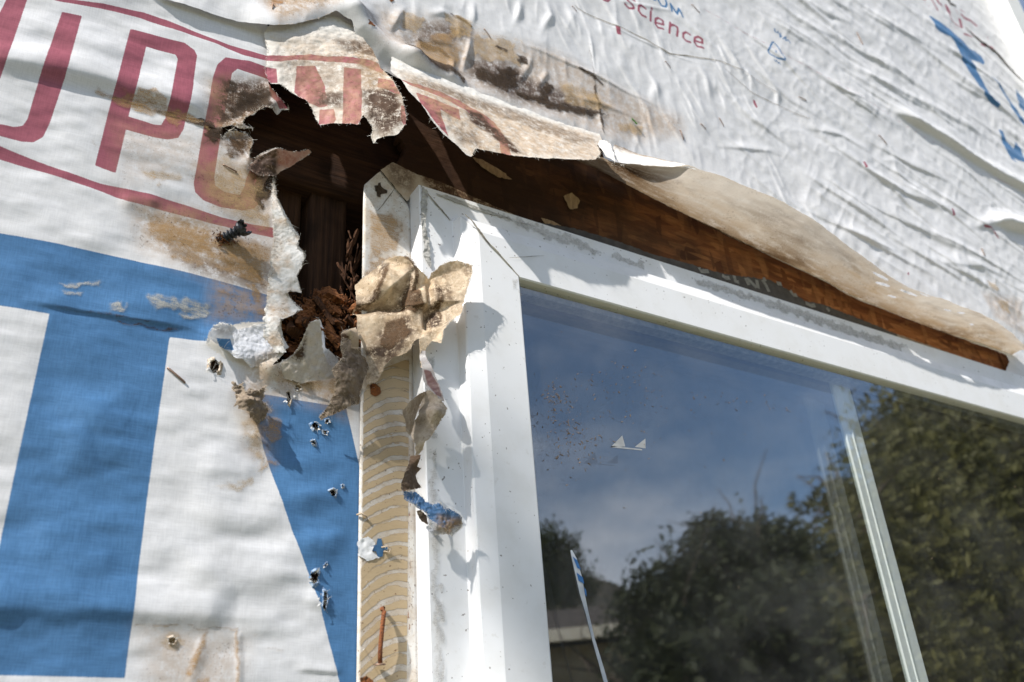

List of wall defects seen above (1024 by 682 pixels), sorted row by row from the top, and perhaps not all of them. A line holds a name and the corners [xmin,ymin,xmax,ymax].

water stain [403,11,642,133]
hole [344,271,362,321]